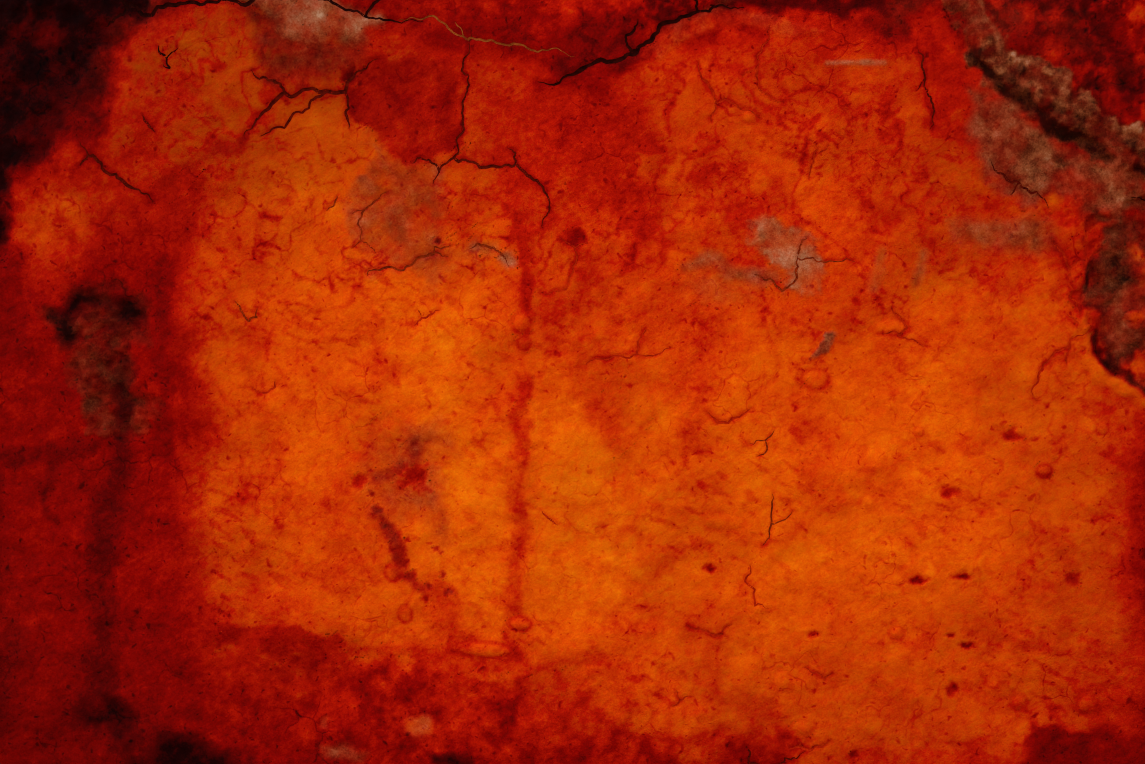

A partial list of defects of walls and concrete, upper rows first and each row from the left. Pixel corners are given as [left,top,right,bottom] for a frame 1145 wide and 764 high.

crack [105,0,255,27]
crack [158,45,178,69]
crack [244,58,378,136]
crack [698,29,776,122]
crack [80,143,153,202]
crack [323,0,744,295]
spalling [1064,211,1145,411]